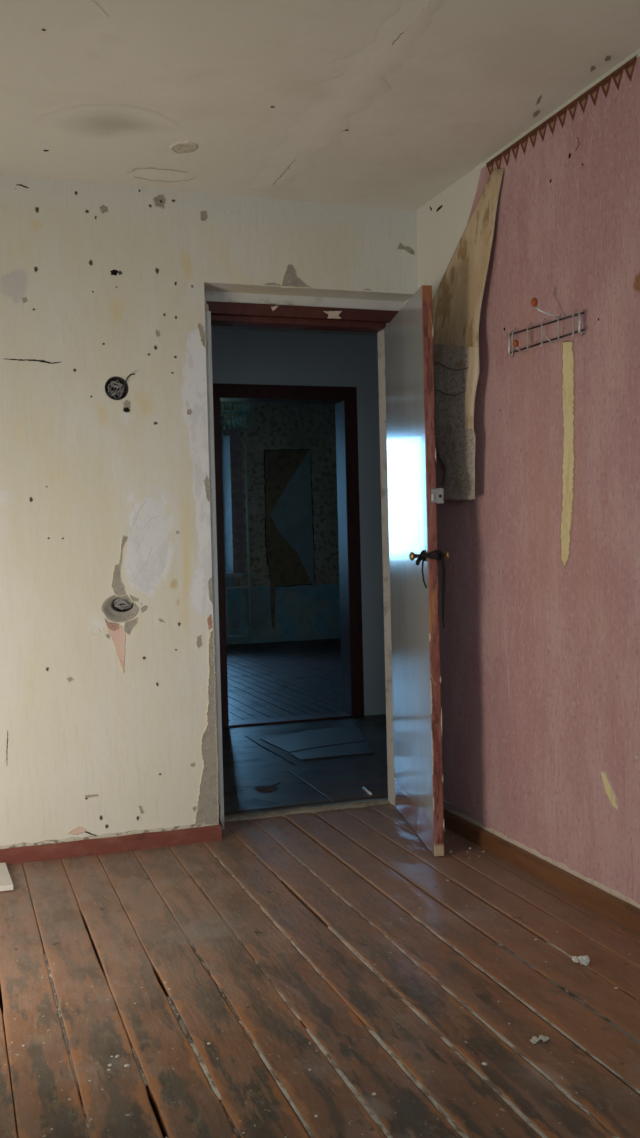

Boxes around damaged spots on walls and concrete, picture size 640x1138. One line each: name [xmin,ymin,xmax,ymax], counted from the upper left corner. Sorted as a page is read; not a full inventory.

spalling [264,264,312,289]
spalling [90,535,165,674]
spalling [0,577,223,849]